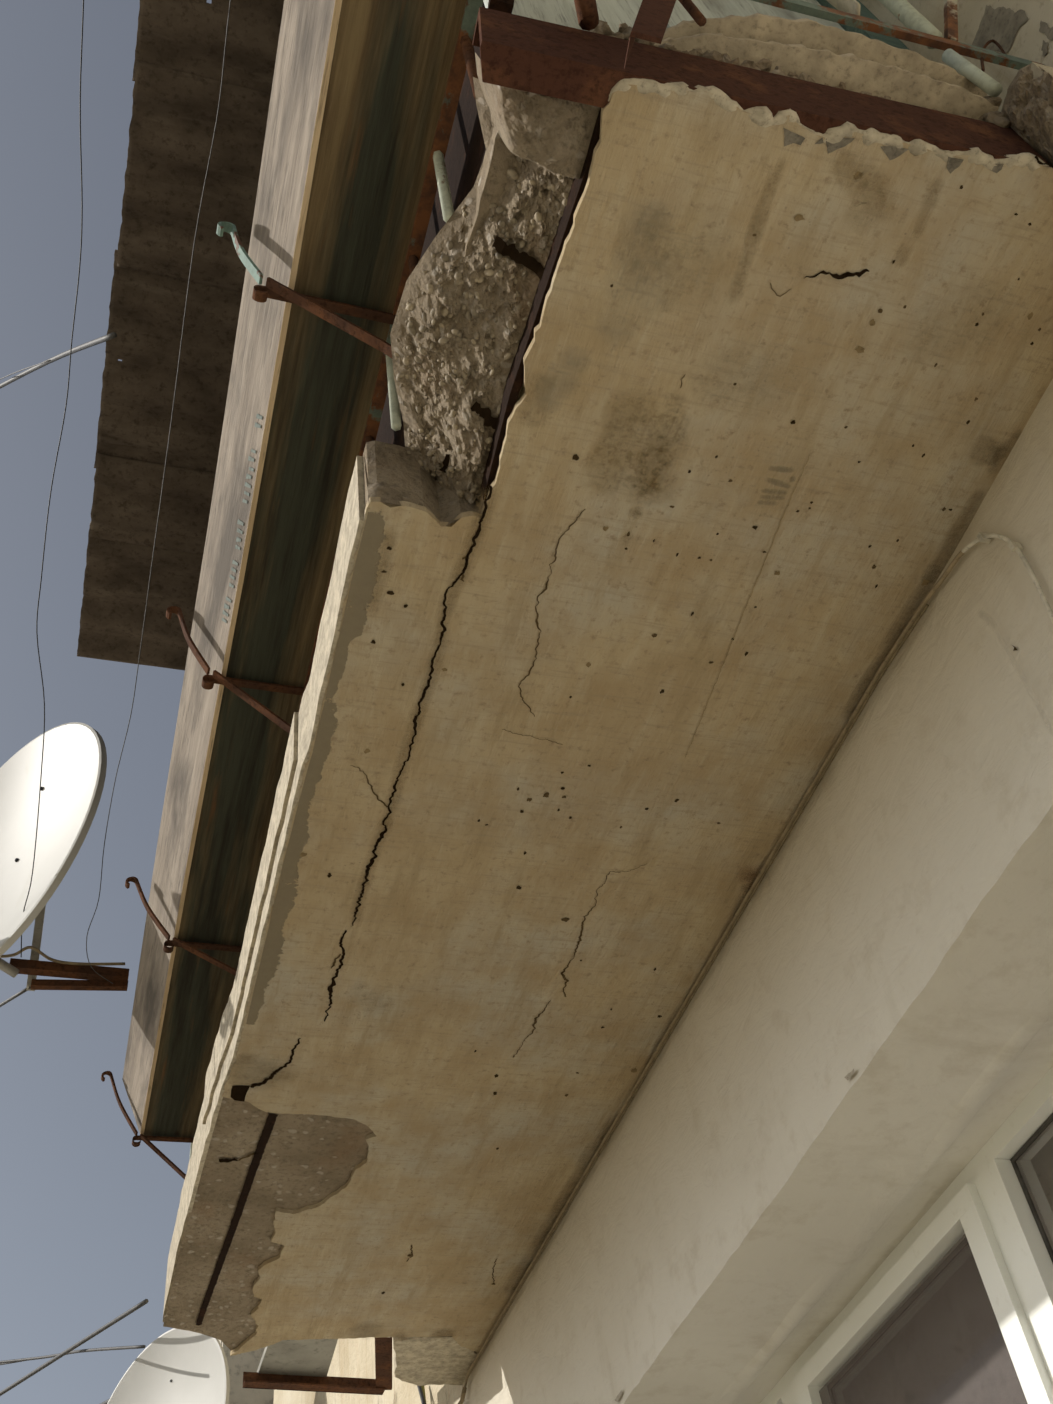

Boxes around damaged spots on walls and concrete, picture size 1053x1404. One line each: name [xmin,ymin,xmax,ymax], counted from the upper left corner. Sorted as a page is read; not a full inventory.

flaking render [972,4,1053,57]
crack [977,63,1053,168]
spalling [390,53,1048,504]
crack [502,509,585,745]
crack [231,485,493,1102]
crack [513,864,646,1057]
spalling [163,1097,373,1351]